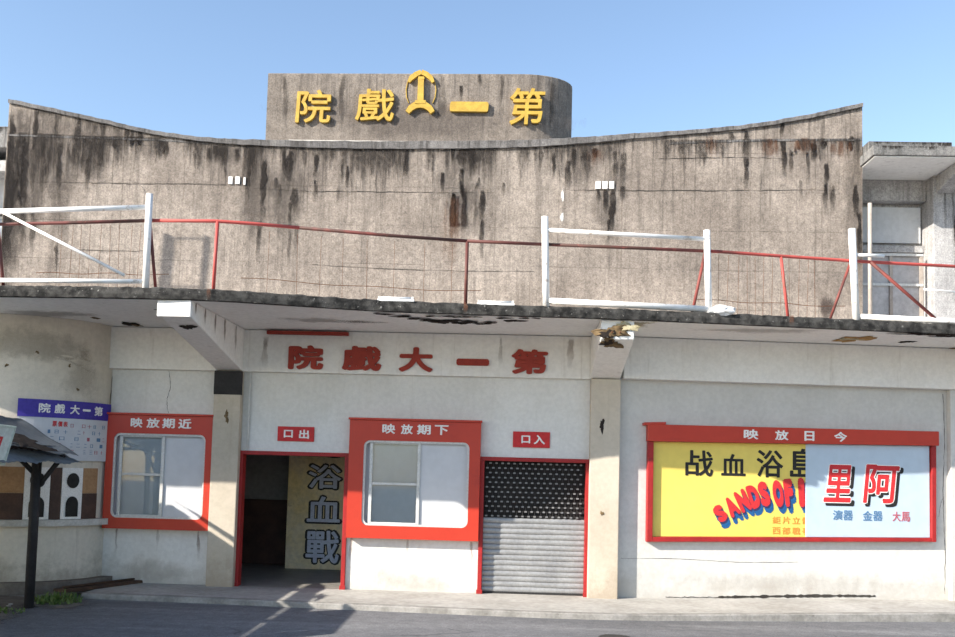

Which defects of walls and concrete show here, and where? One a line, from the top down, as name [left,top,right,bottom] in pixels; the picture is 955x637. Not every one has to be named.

damp [0,110,414,256]
damp [427,148,498,240]
damp [518,141,626,186]
damp [597,186,625,231]
damp [655,123,862,199]
damp [852,185,862,253]
peeling [373,313,541,325]